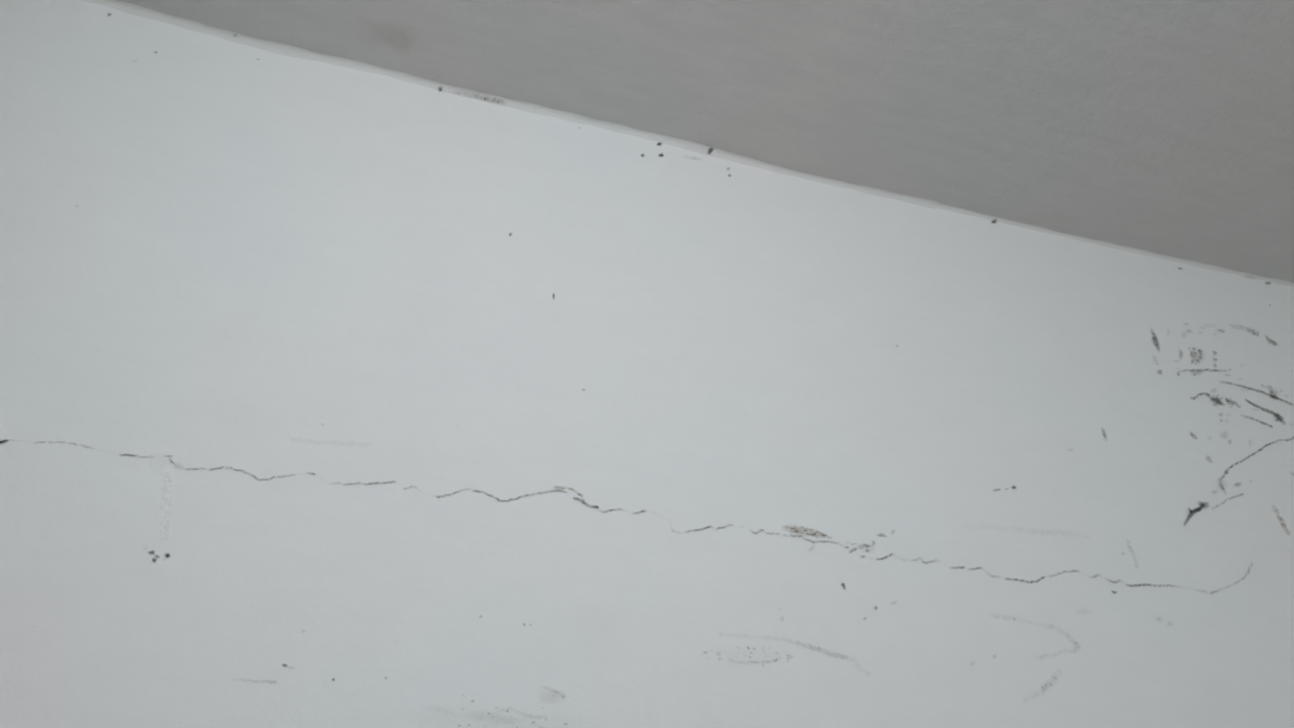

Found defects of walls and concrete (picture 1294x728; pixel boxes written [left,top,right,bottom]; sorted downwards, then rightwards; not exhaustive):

crack [1188,504,1204,518]